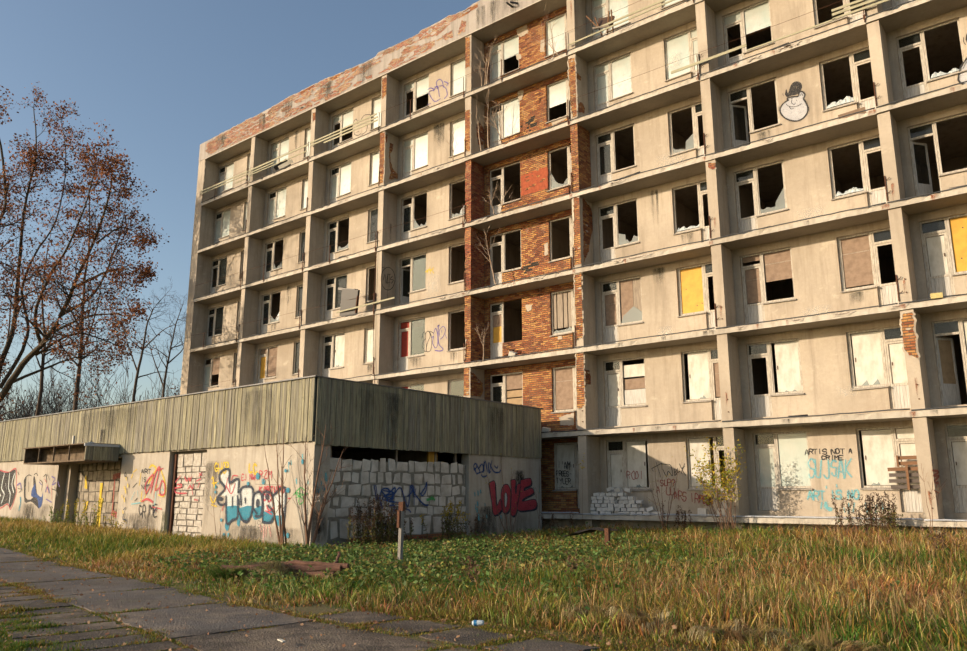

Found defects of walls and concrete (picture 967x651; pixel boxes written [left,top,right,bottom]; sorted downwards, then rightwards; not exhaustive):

flaking render [201,2,479,185]
flaking render [567,57,589,119]
flaking render [464,109,492,153]
peeling [521,167,548,196]
flaking render [890,303,920,360]